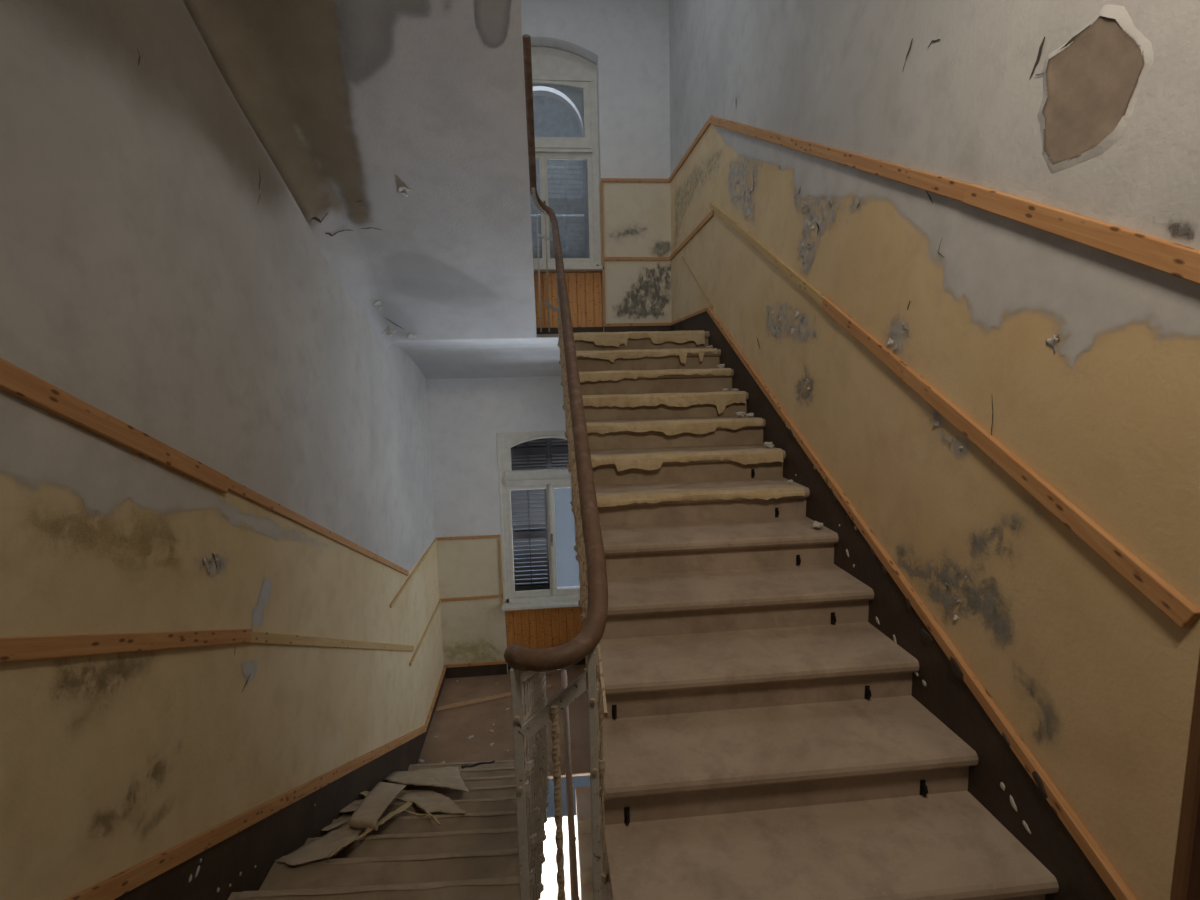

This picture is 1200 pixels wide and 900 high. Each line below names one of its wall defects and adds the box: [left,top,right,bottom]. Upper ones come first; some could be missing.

leakage [183,0,458,238]
leakage [473,0,513,48]
leakage [605,139,724,323]
peeling [714,126,1200,374]
spalling [1030,5,1154,173]
leakage [886,490,1069,758]